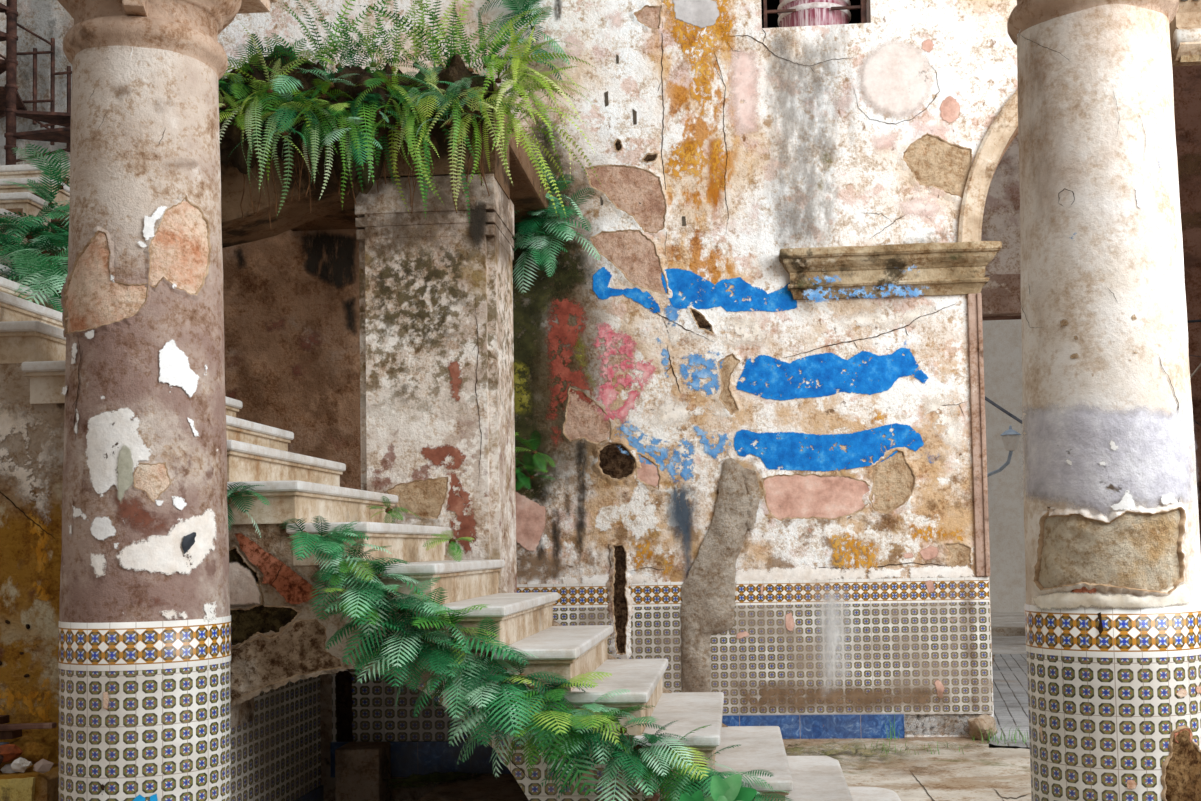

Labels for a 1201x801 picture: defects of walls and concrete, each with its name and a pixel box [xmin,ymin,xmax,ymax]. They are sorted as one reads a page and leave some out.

flaking render [61,190,214,364]
flaking render [581,136,673,302]
corrosion [663,0,736,212]
leakage [781,45,830,234]
flaking render [873,127,977,217]
peeling [447,361,462,402]
peeling [650,303,771,425]
flaking render [68,396,353,742]
flaking render [383,444,477,554]
flaking render [756,446,922,532]
flaking render [1031,489,1189,597]
spalling [1160,725,1201,801]